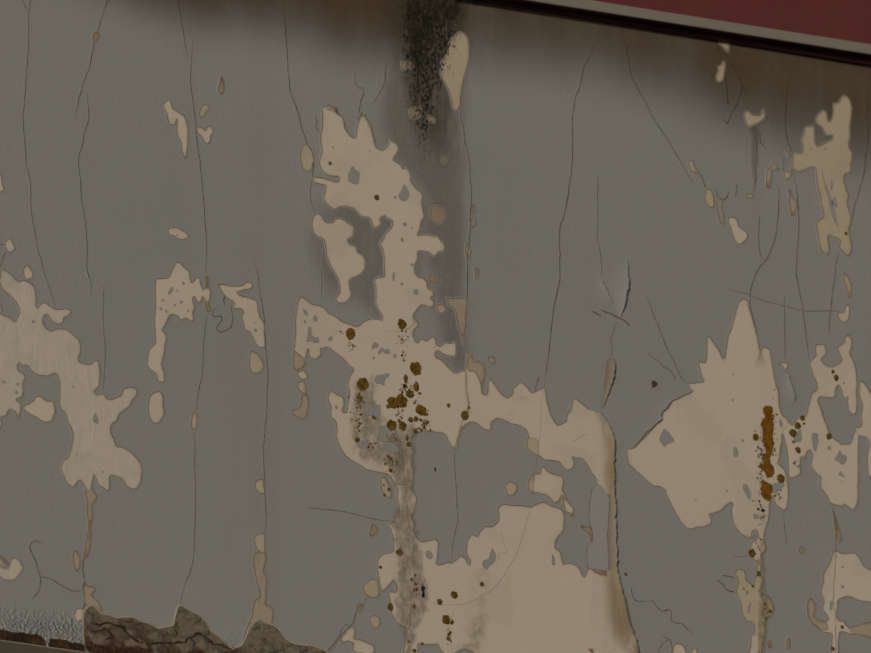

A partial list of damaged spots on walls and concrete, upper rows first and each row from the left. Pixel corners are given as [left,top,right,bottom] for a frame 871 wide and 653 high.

peeling [0,261,376,653]
peeling [289,95,871,653]